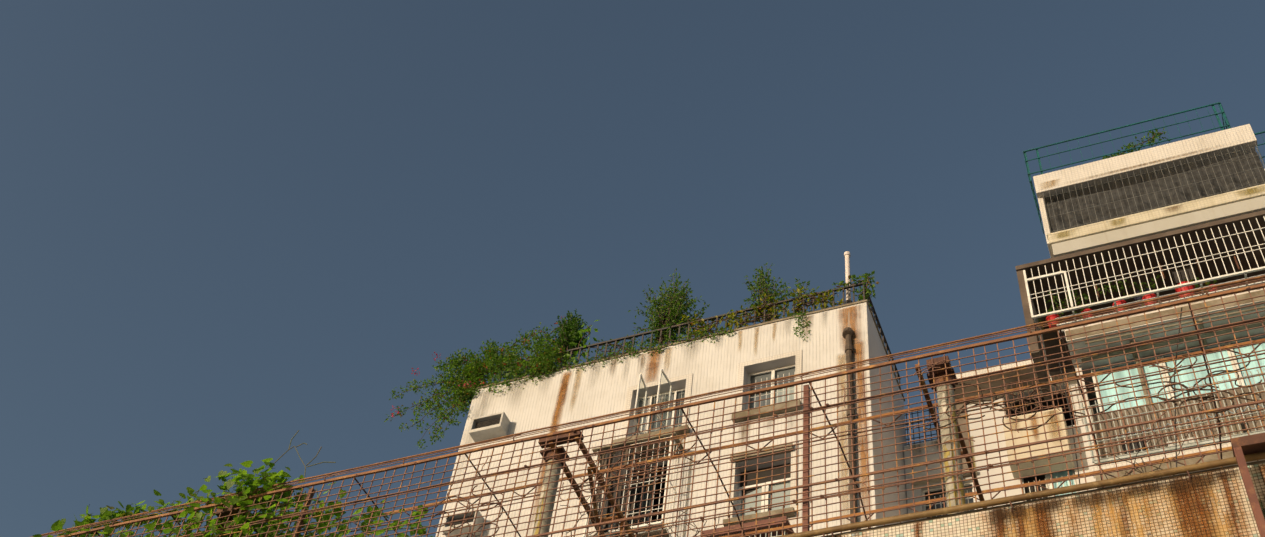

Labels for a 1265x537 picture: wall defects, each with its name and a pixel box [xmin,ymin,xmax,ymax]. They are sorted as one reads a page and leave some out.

corrosion [538,372,580,494]
corrosion [839,306,868,495]
corrosion [983,471,1248,537]